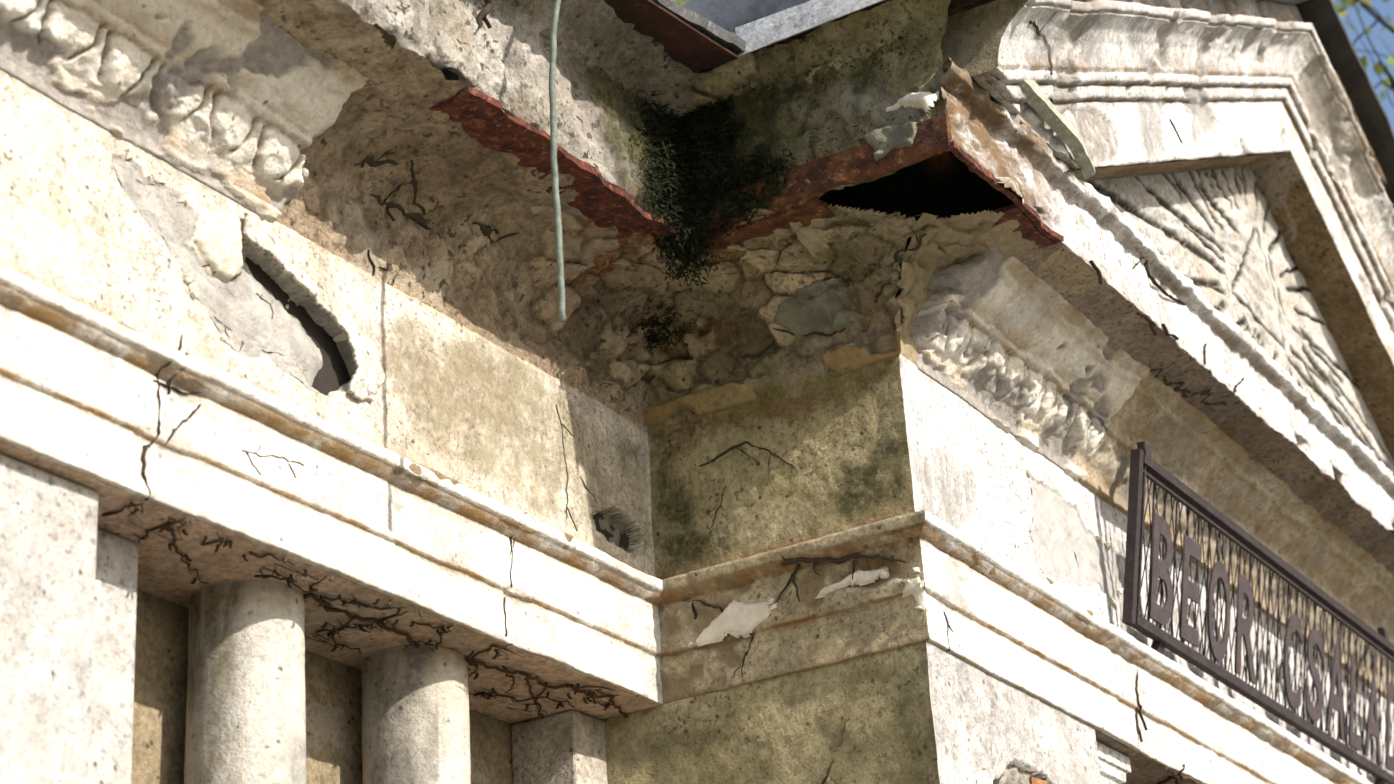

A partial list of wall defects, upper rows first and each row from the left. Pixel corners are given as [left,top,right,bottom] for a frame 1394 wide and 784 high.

crack [355,148,432,229]
crack [203,264,284,356]
peeling [113,149,386,402]
crack [367,249,387,276]
peeling [795,225,830,257]
spalling [843,283,905,346]
crack [141,334,202,501]
crack [555,404,597,531]
crack [503,512,533,637]
peeling [687,598,778,648]
peeling [815,566,929,612]
spalling [976,765,1049,784]